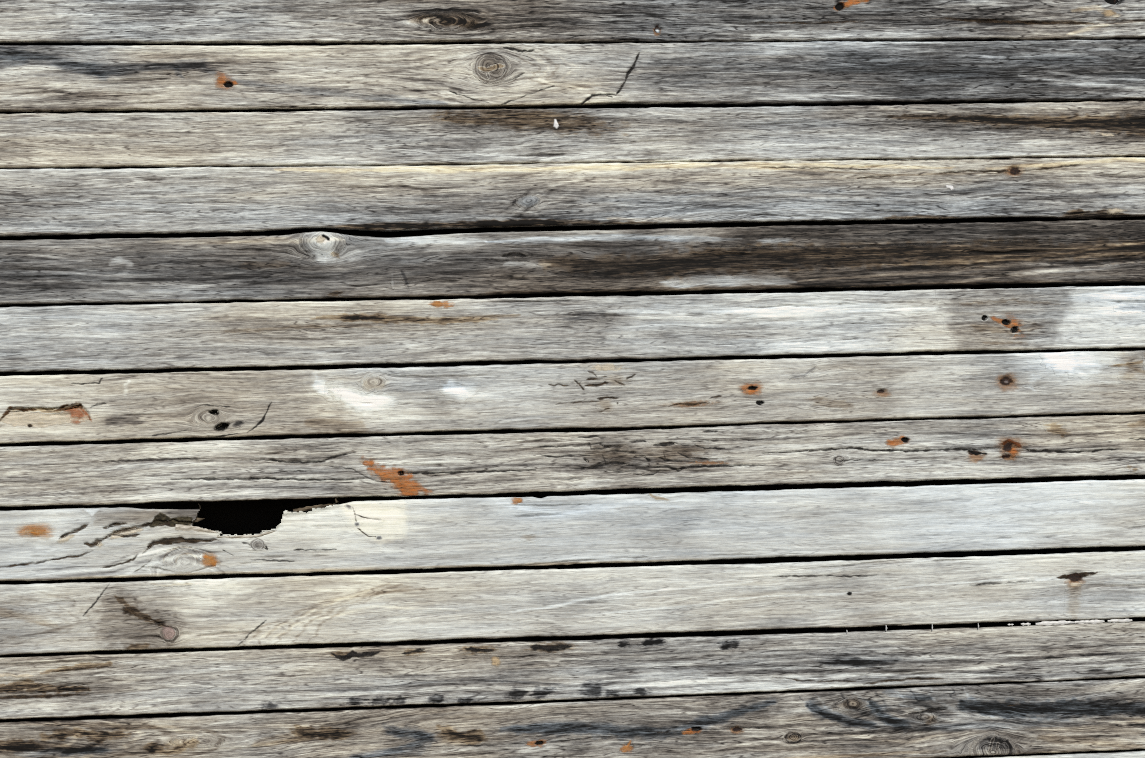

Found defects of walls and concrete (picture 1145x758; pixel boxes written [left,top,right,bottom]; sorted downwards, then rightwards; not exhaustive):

crack [581,53,639,105]
corrosion [981,316,1021,336]
corrosion [741,384,764,405]
crack [105,364,993,548]
corrosion [887,436,909,446]
crack [1026,438,1145,461]
corrosion [363,460,431,496]
spalling [287,498,339,513]
corrosion [19,525,48,536]
spalling [175,504,275,539]
crack [1,508,332,616]
crack [779,572,868,580]